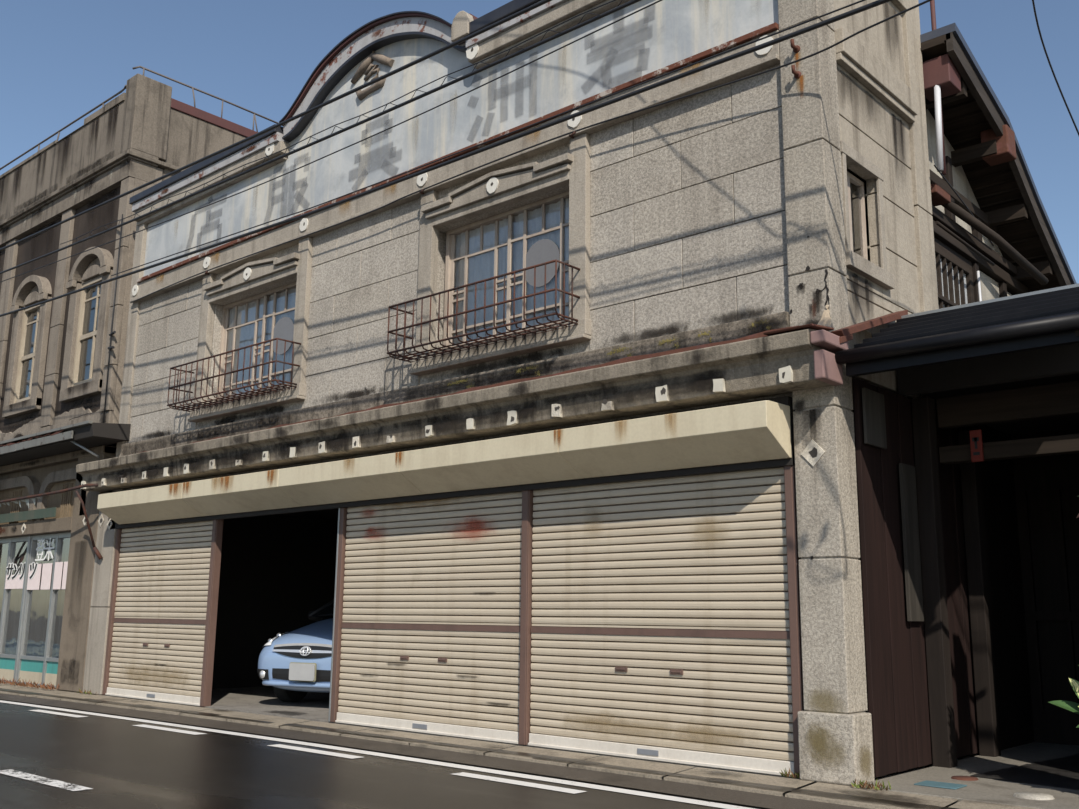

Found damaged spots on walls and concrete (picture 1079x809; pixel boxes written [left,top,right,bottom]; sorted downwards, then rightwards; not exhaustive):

crack [821,269,831,320]
spalling [817,305,831,327]
damp [619,327,678,342]
damp [457,350,561,395]
damp [694,374,722,390]
damp [332,388,370,401]
damp [218,406,309,454]